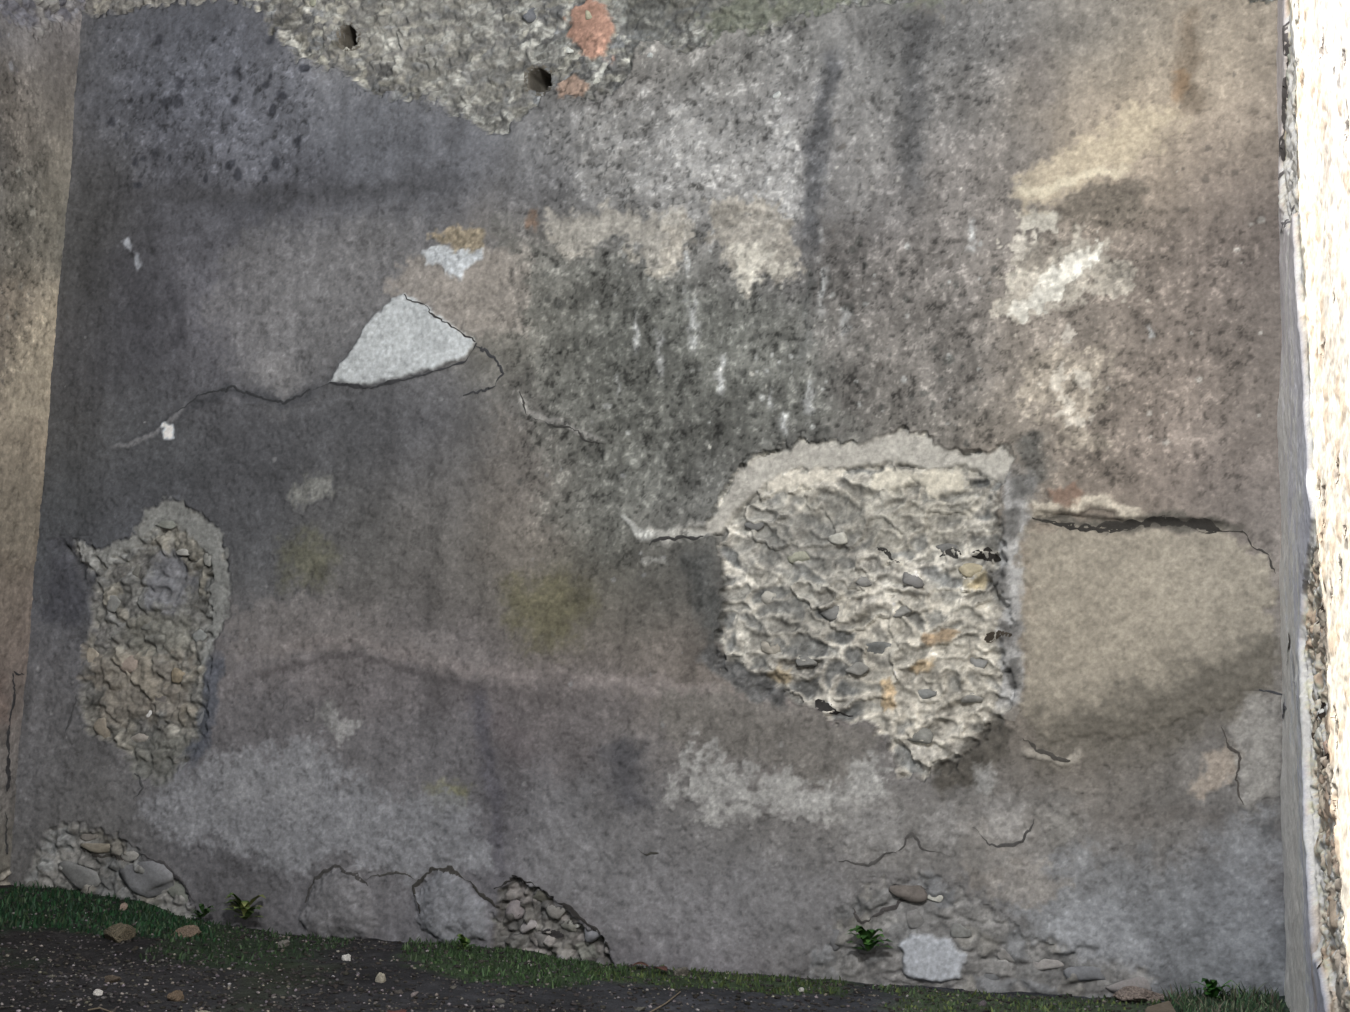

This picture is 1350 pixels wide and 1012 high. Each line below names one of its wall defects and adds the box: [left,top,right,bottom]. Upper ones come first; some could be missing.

flaking render [0,0,902,135]
crack [115,373,333,451]
spalling [330,343,477,389]
crack [404,294,609,444]
crack [1021,479,1276,574]
flaking render [44,495,234,787]
flaking render [694,425,1160,998]
flaking render [1299,457,1350,1012]
flaking render [0,820,198,920]
crack [368,871,417,881]
flaking render [489,875,614,965]